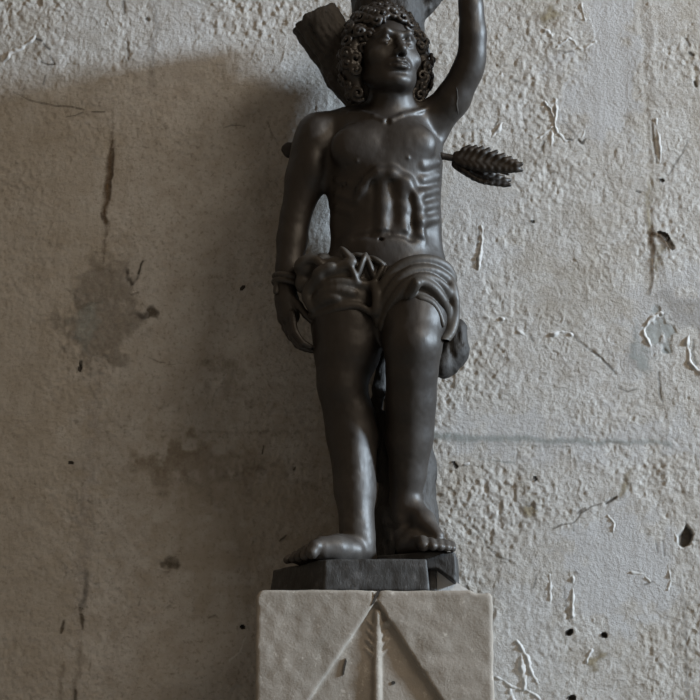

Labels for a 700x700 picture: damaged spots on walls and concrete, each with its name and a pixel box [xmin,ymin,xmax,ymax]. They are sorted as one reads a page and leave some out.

spalling [642,309,674,353]
peeling [684,332,700,375]
spalling [673,523,692,550]